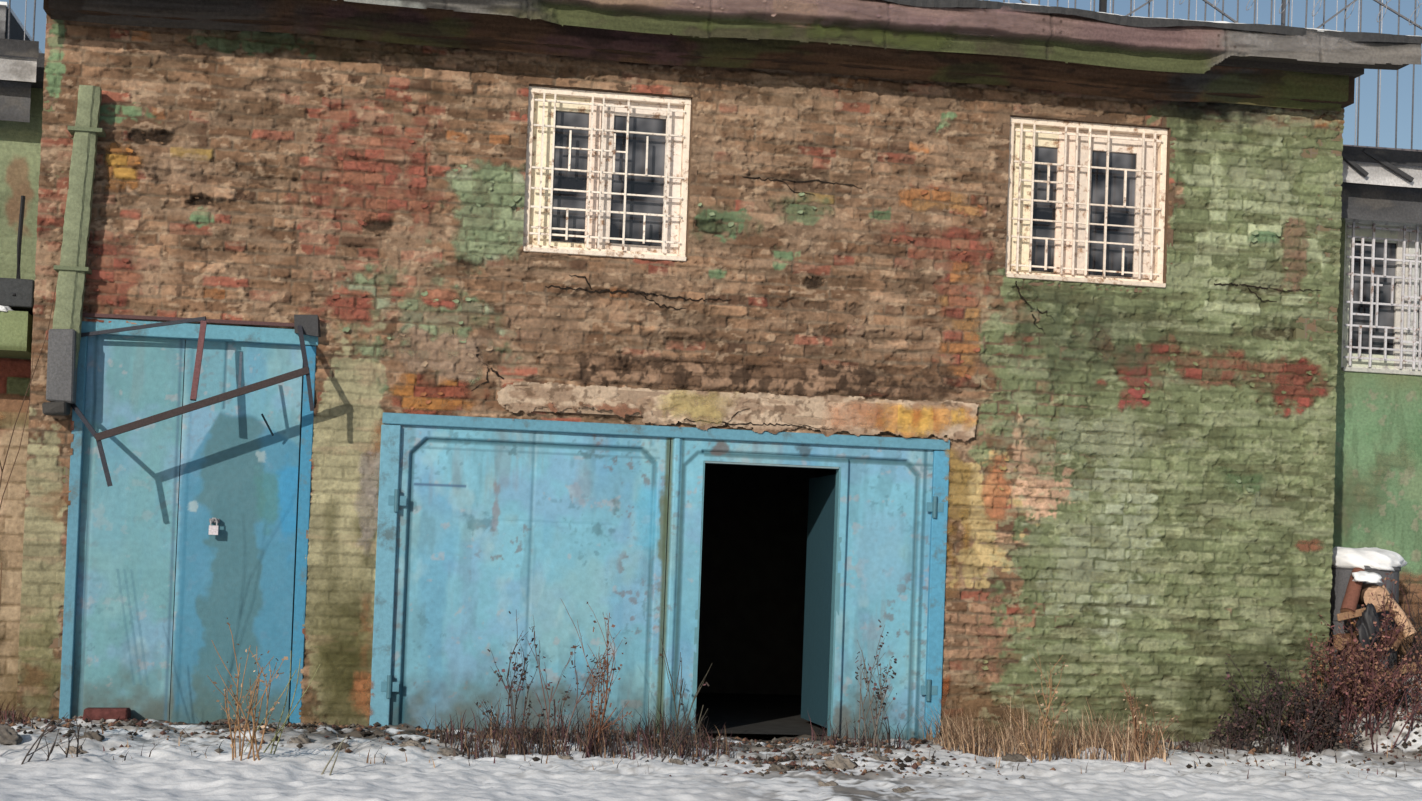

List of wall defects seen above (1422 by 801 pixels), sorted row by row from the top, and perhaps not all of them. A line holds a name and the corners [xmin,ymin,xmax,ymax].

crack [742,176,862,196]
crack [545,275,731,310]
crack [1214,283,1321,302]
peeling [1071,322,1328,416]
spalling [545,400,641,418]